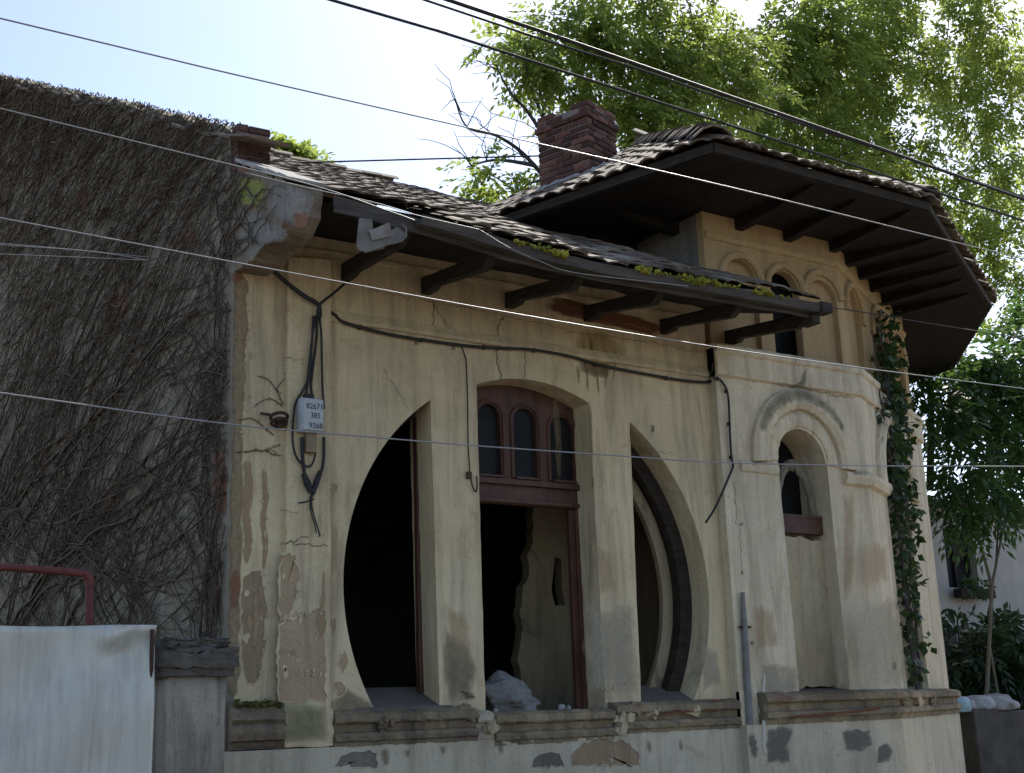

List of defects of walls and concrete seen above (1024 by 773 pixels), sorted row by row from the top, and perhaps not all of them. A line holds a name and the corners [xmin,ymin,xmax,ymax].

crack [371,289,715,382]
flaking render [213,273,349,704]
crack [281,510,327,547]
flaking render [334,749,380,769]
flaking render [530,737,640,769]